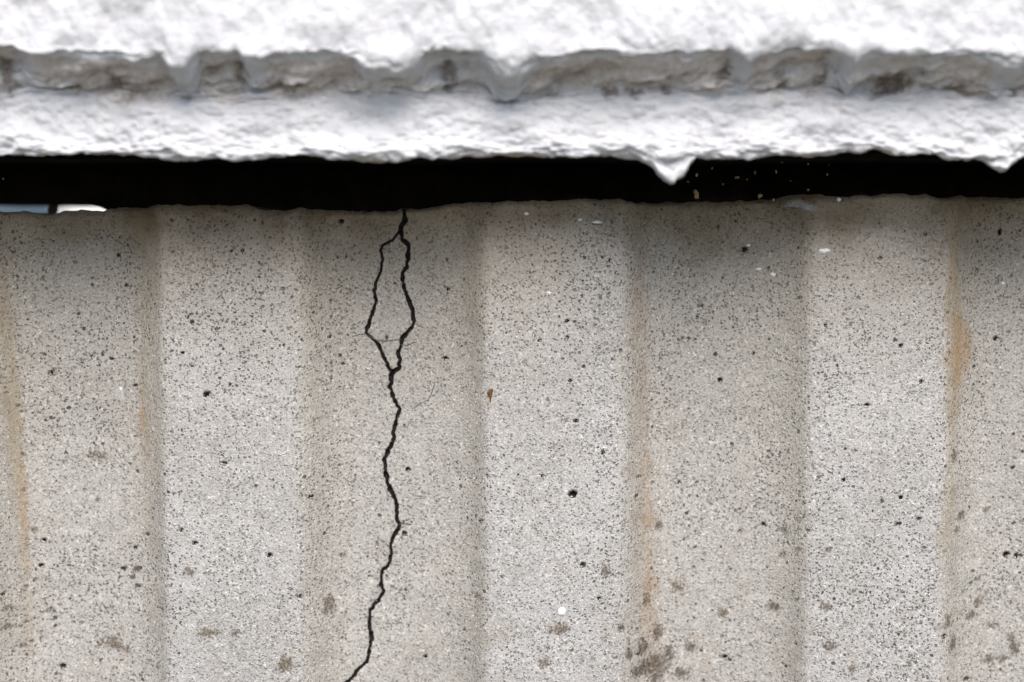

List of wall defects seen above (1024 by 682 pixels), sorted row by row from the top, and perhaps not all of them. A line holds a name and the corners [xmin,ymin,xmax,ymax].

crack [345,209,435,682]